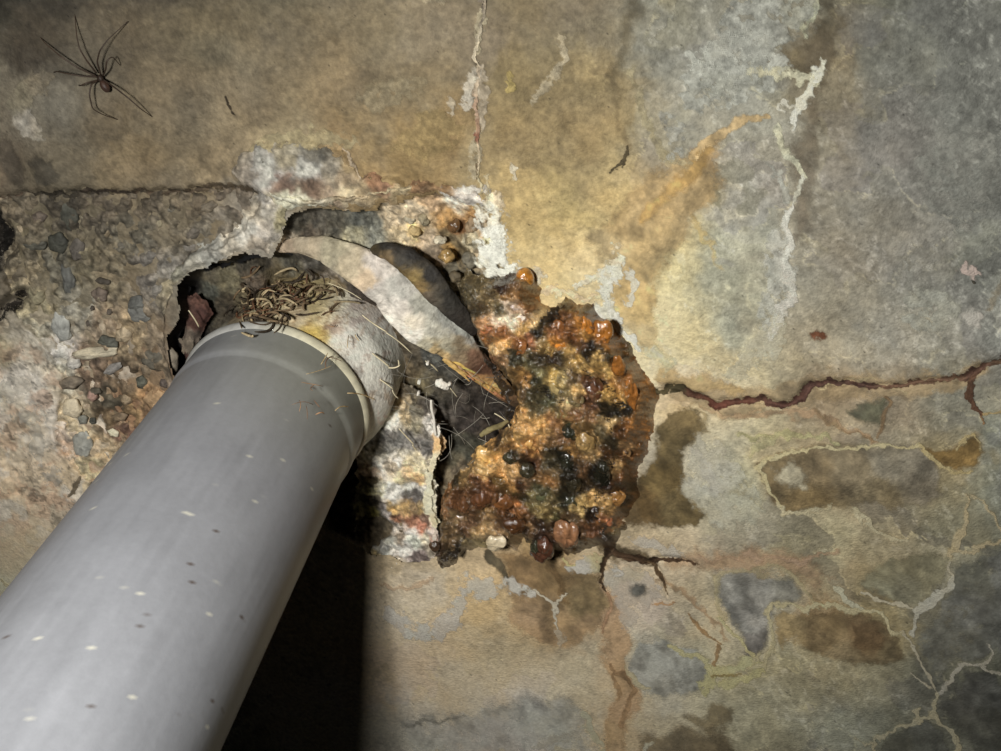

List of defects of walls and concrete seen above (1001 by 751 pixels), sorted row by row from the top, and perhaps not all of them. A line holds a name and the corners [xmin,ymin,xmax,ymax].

spalling [0,183,417,481]
spalling [352,382,447,568]
corrosion [588,114,770,349]
water stain [381,174,983,647]
water stain [678,0,845,380]
crack [655,355,1001,425]
crack [597,545,740,678]